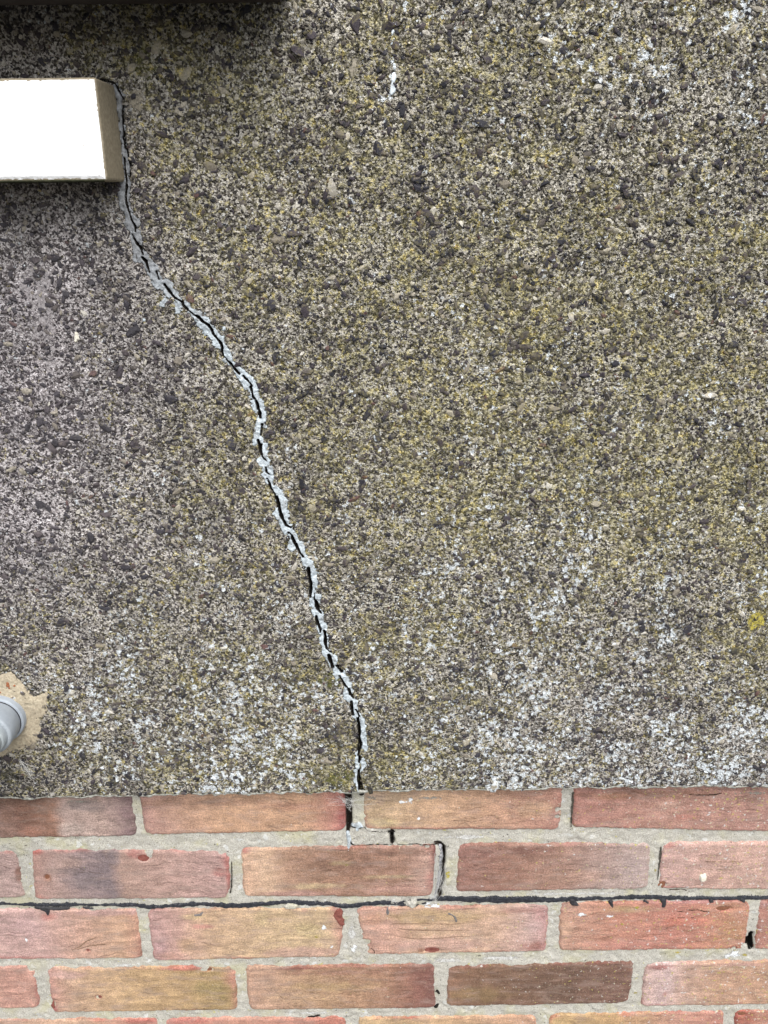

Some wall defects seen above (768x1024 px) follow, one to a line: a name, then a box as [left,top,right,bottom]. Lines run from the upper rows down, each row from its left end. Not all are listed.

crack [100,78,368,796]
crack [568,792,576,827]
crack [349,825,437,845]
crack [657,847,738,919]
crack [392,923,470,939]